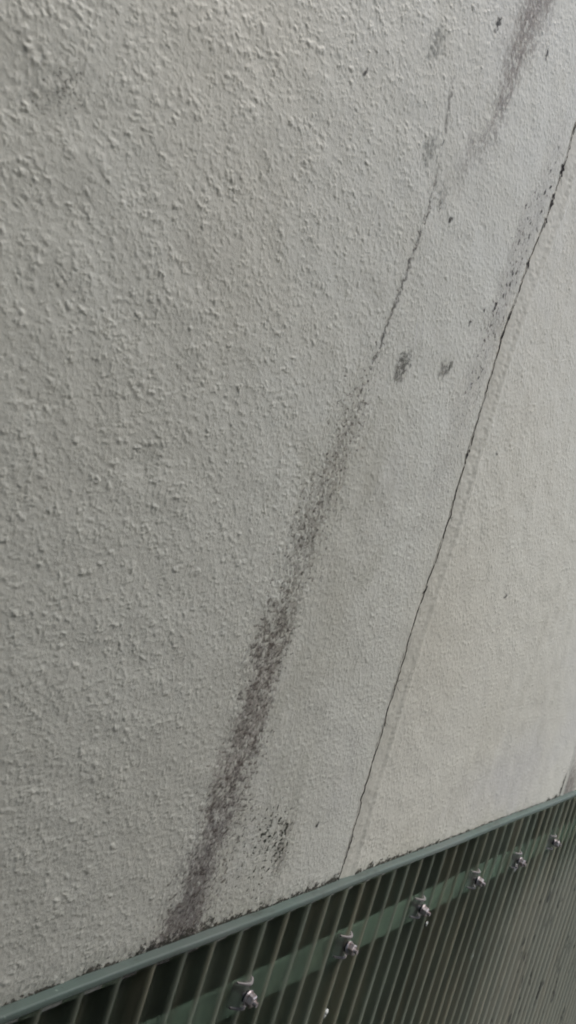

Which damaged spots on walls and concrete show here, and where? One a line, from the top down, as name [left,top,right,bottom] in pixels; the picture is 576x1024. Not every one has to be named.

leakage [465,170,554,393]
crack [338,125,576,880]
leakage [2,579,339,1007]
leakage [355,773,567,874]